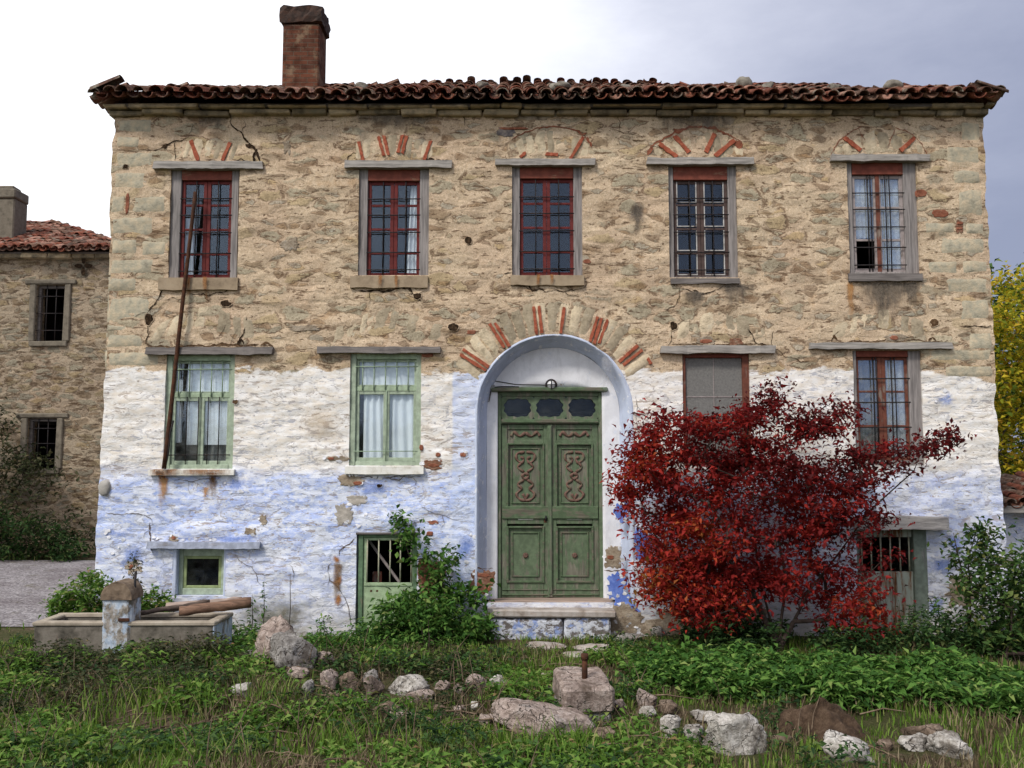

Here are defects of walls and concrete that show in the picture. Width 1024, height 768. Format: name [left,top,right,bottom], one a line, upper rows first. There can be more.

crack [138,126,193,158]
crack [230,115,269,169]
crack [135,276,273,348]
corrosion [152,469,224,497]
spalling [322,455,387,526]
spalling [152,514,267,542]
corrosion [334,557,342,604]
spalling [602,529,767,636]